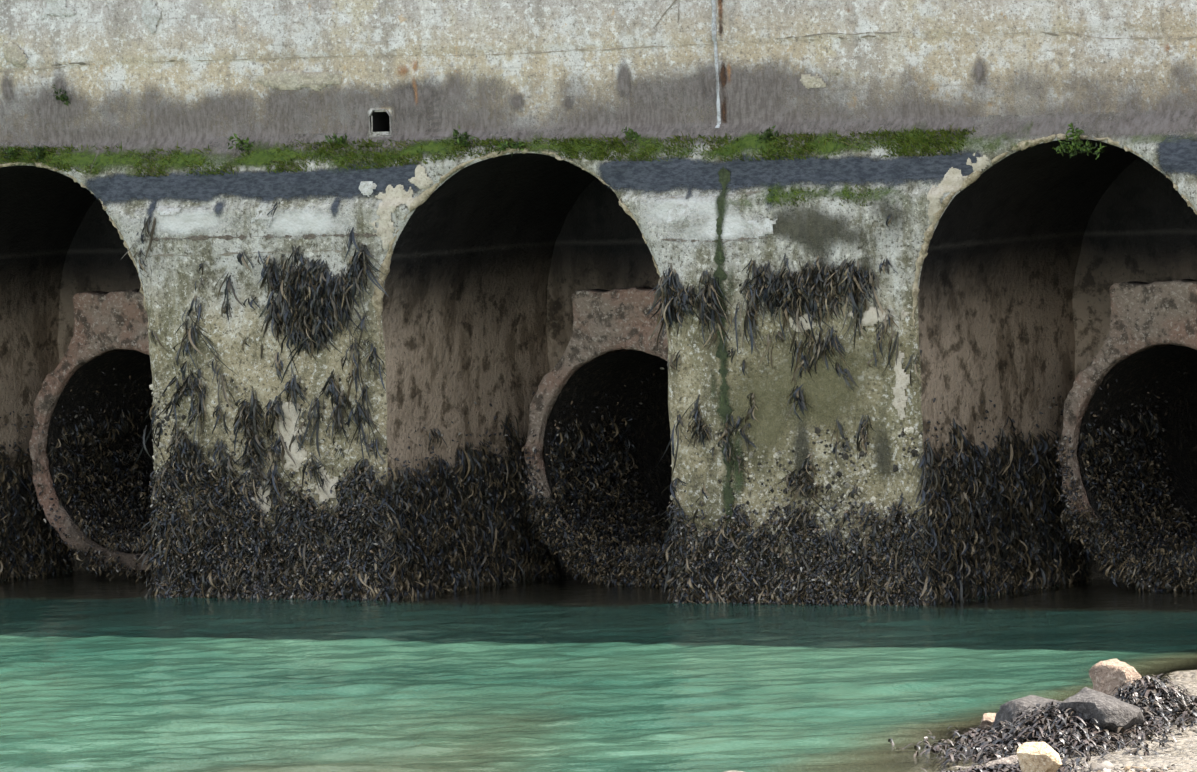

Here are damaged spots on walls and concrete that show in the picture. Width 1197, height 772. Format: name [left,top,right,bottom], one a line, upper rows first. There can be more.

rust [720,63,730,123]
water stain [0,61,1197,289]
water stain [715,237,732,304]